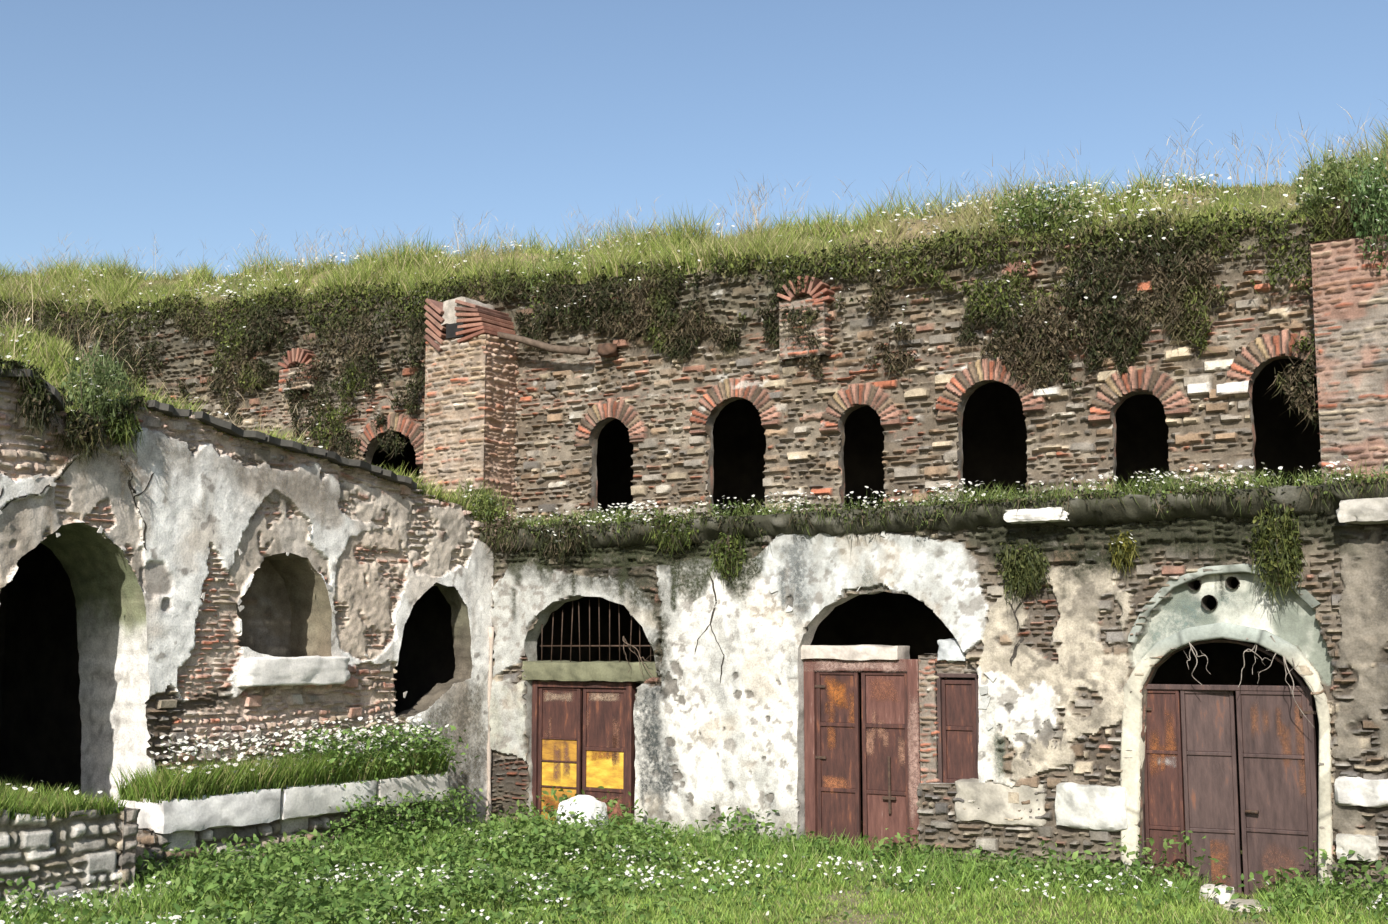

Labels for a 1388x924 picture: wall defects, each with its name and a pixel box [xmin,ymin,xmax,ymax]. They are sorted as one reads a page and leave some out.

peeling [0,382,174,612]
spalling [177,480,475,700]
spalling [768,582,794,612]
spalling [1018,584,1060,662]
hole [661,661,686,706]
hole [732,673,754,699]
spalling [978,671,1058,766]
hole [669,765,693,806]
hole [708,805,756,836]